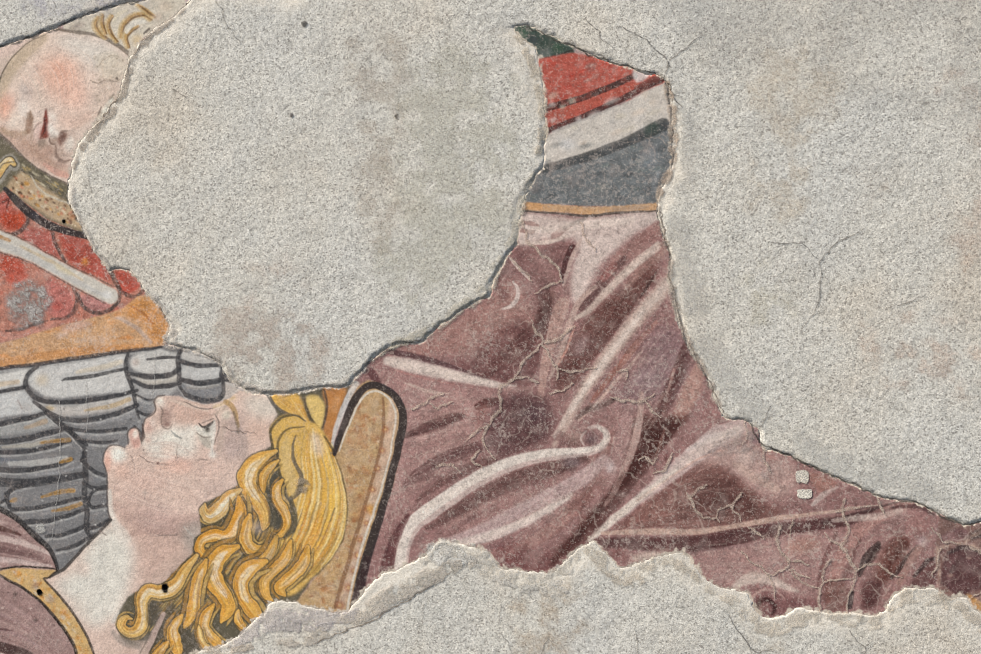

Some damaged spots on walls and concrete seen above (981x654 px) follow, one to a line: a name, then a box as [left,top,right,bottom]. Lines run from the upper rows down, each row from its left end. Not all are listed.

crack [526,18,701,104]
spalling [73,68,131,169]
spalling [163,174,534,395]
crack [512,220,563,294]
crack [660,215,724,411]
crack [772,235,853,326]
crack [411,393,453,410]
crack [439,319,661,473]
crack [638,452,673,474]
peeling [796,470,812,498]
crack [686,421,981,614]
spalling [278,539,736,647]